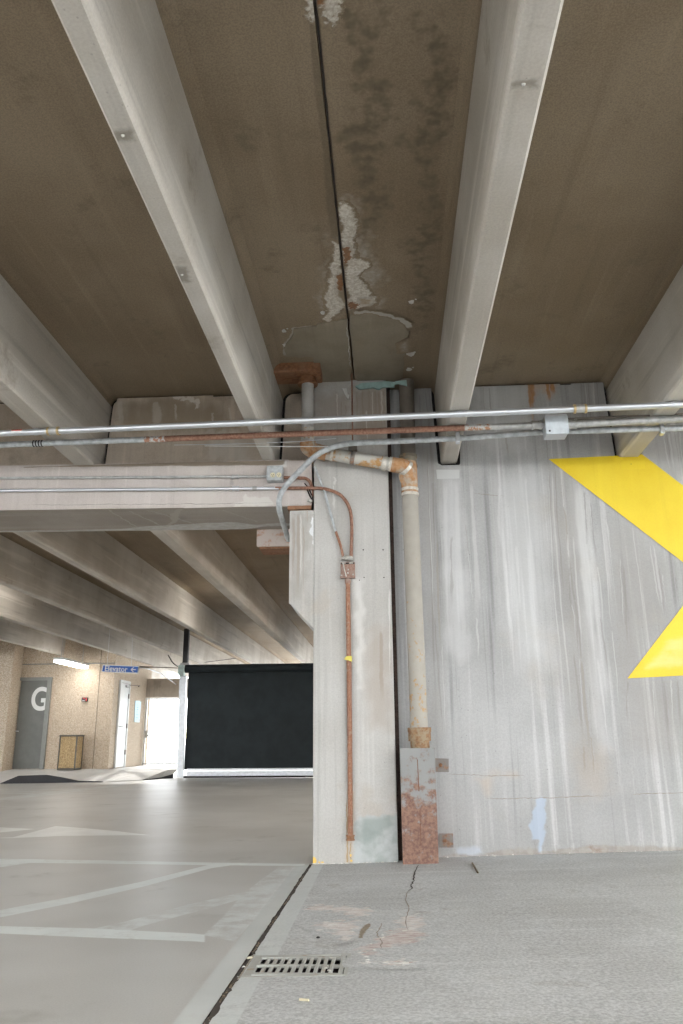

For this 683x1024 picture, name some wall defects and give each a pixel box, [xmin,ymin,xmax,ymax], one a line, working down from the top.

crack [307,0,349,321]
damp [299,0,466,337]
rust [342,788,358,863]
crack [376,866,420,948]